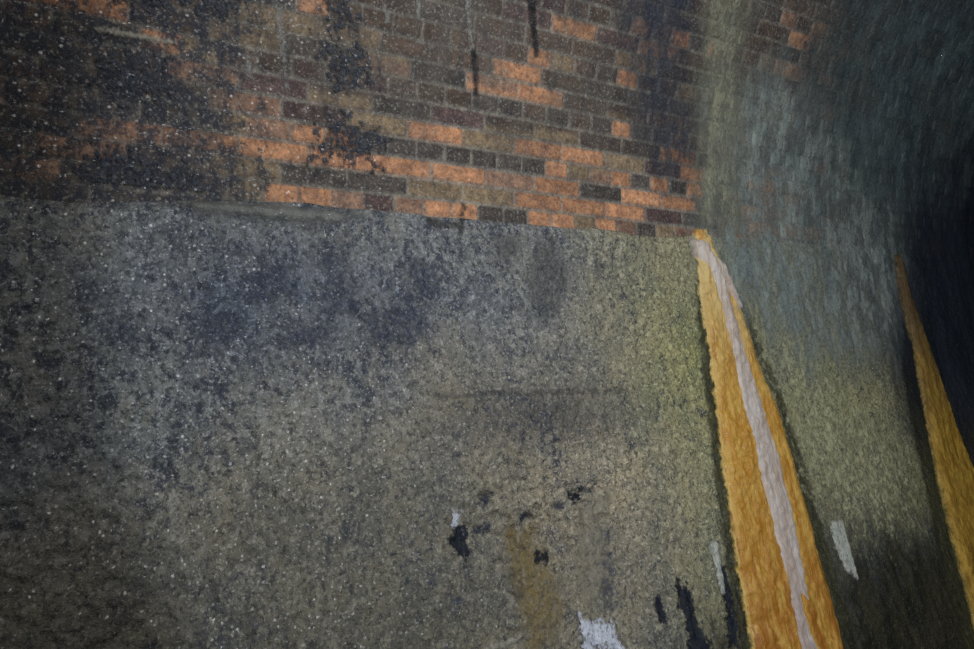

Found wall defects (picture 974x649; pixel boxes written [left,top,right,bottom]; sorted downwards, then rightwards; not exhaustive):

damp [528,0,539,56]
peeling [578,611,624,649]
spalling [655,578,713,649]